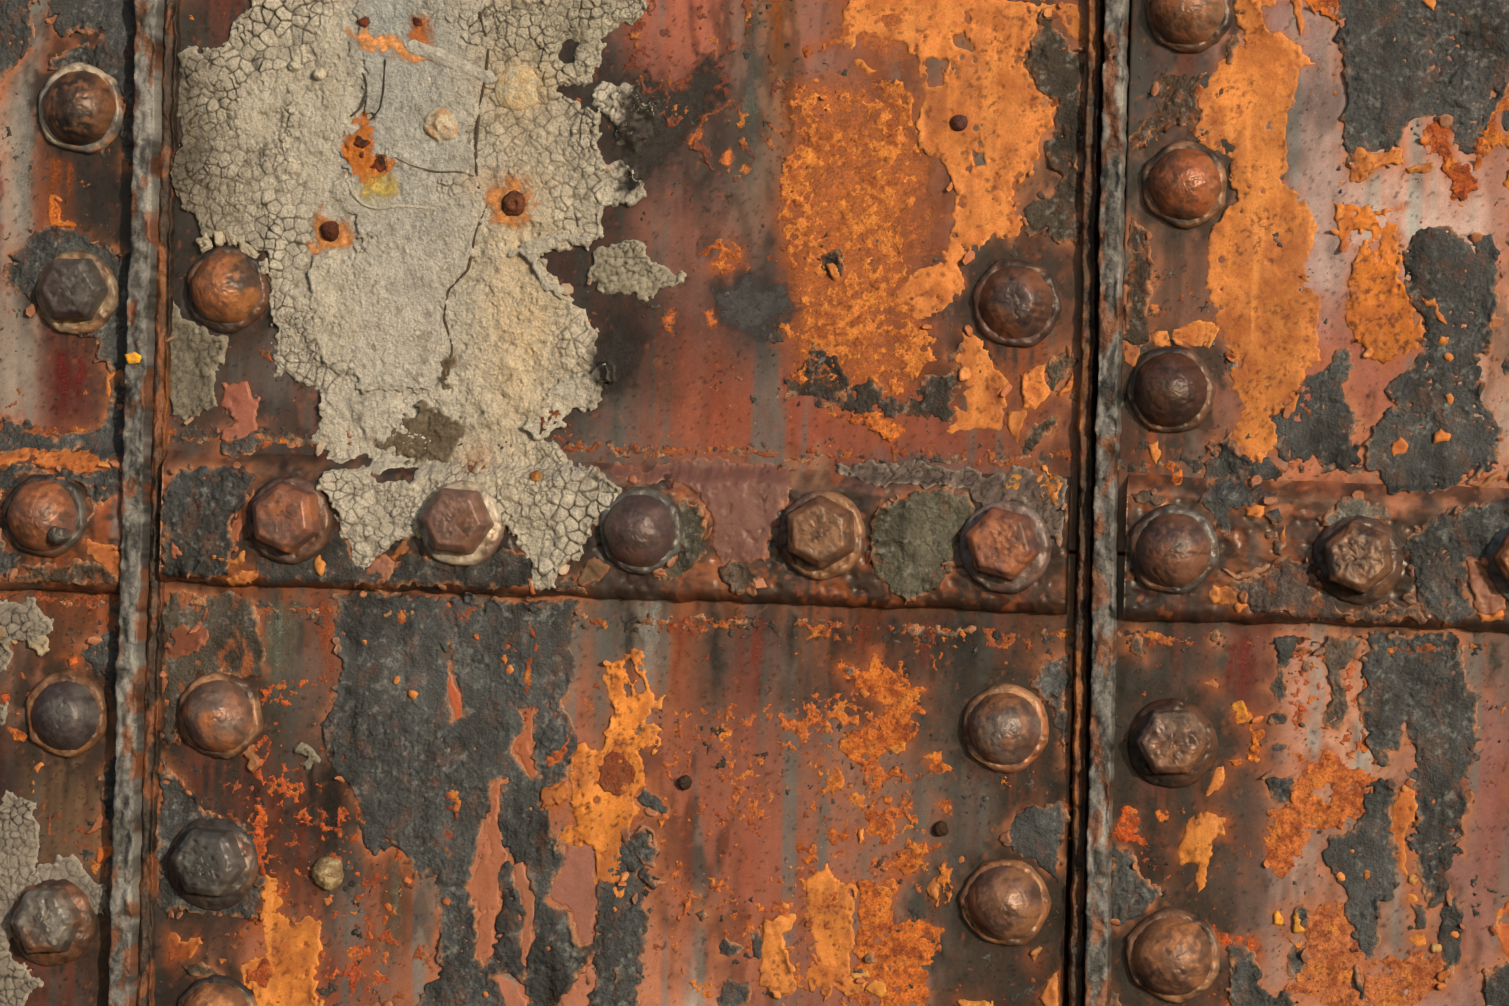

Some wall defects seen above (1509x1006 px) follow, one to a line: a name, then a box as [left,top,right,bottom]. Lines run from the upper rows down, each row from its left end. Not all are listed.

peeling [0,0,137,167]
crack [346,0,489,376]
corrosion [551,0,1087,468]
corrosion [1123,0,1509,477]
peeling [1332,0,1509,169]
peeling [0,225,131,672]
peeling [155,0,796,1006]
peeling [1198,225,1509,1006]
peeling [0,753,116,1006]
corrosion [168,780,405,1006]
corrosion [1112,700,1265,955]
corrosion [1283,785,1459,1006]